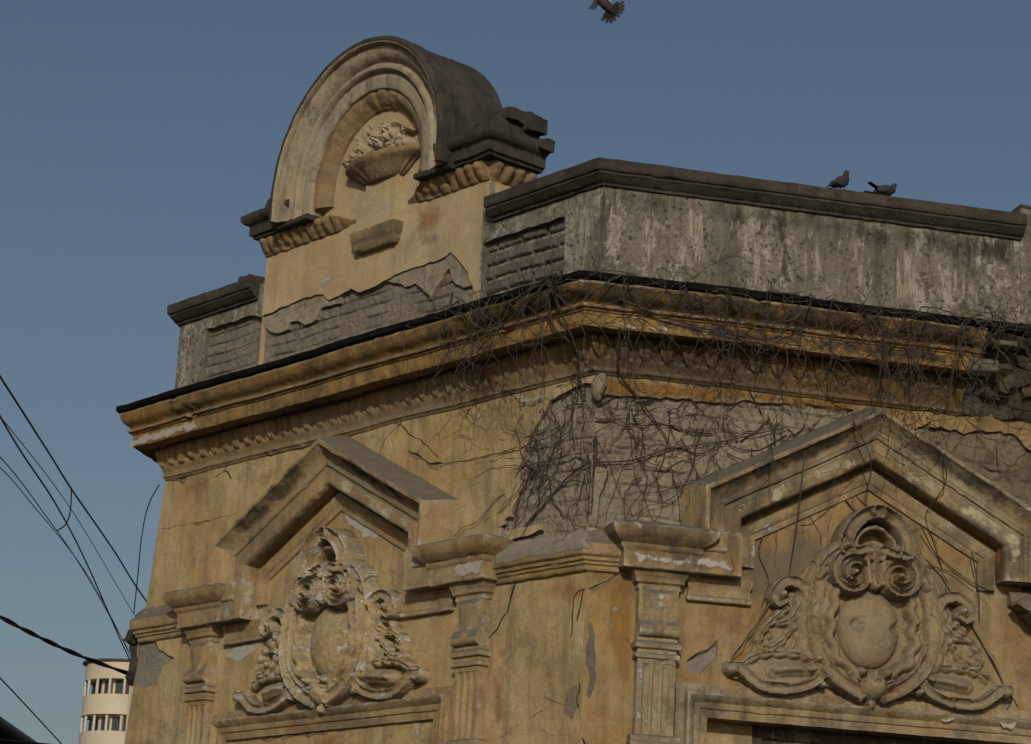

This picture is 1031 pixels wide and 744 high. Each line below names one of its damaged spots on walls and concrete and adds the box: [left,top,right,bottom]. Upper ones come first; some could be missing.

water stain [678,210,704,266]
water stain [731,212,787,274]
spalling [206,219,565,380]
water stain [897,252,918,299]
peeling [129,421,197,446]
crack [396,420,519,471]
spalling [455,373,855,576]
peeling [947,496,1020,563]
crack [489,582,516,638]
spalling [136,641,174,688]
peeling [565,623,596,719]
spalling [687,641,718,675]